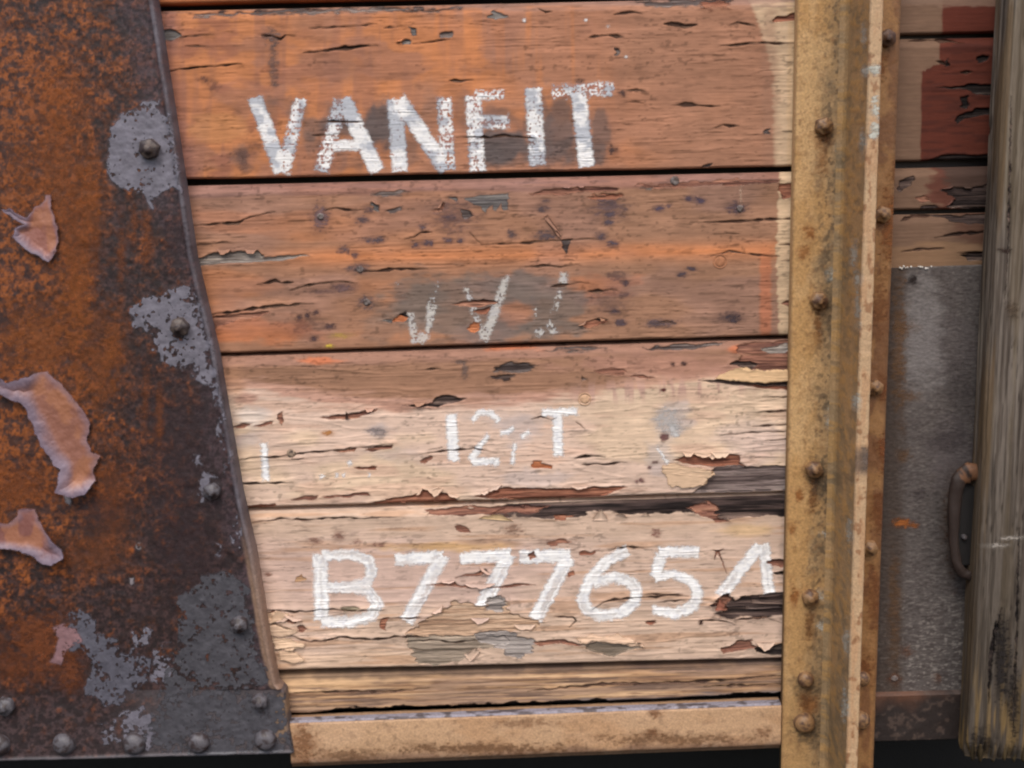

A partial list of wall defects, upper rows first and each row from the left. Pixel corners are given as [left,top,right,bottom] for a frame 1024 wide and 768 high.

peeling [944,84,991,124]
peeling [107,101,183,209]
peeling [129,285,284,466]
peeling [699,340,788,390]
peeling [767,559,783,575]
peeling [710,592,785,624]
rust [2,608,83,694]
peeling [50,571,293,756]
peeling [267,610,307,664]
peeling [721,640,784,655]